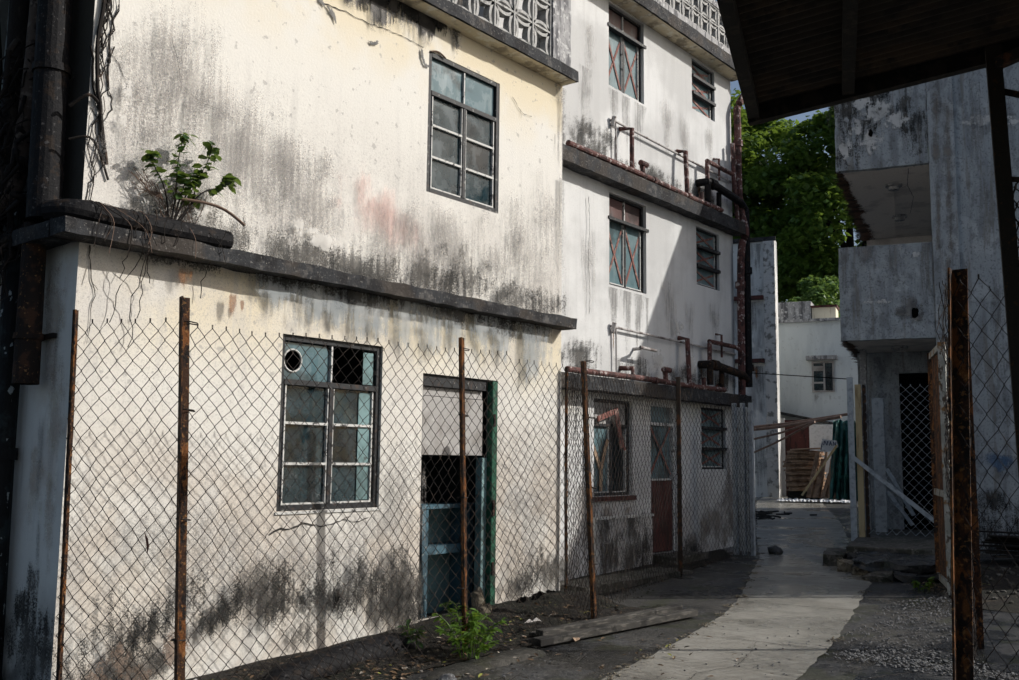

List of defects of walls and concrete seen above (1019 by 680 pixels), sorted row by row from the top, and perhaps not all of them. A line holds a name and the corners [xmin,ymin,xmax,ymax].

crack [326,4,422,47]
leakage [562,115,614,156]
leakage [577,486,655,574]
leakage [4,563,174,680]
leakage [186,544,424,644]